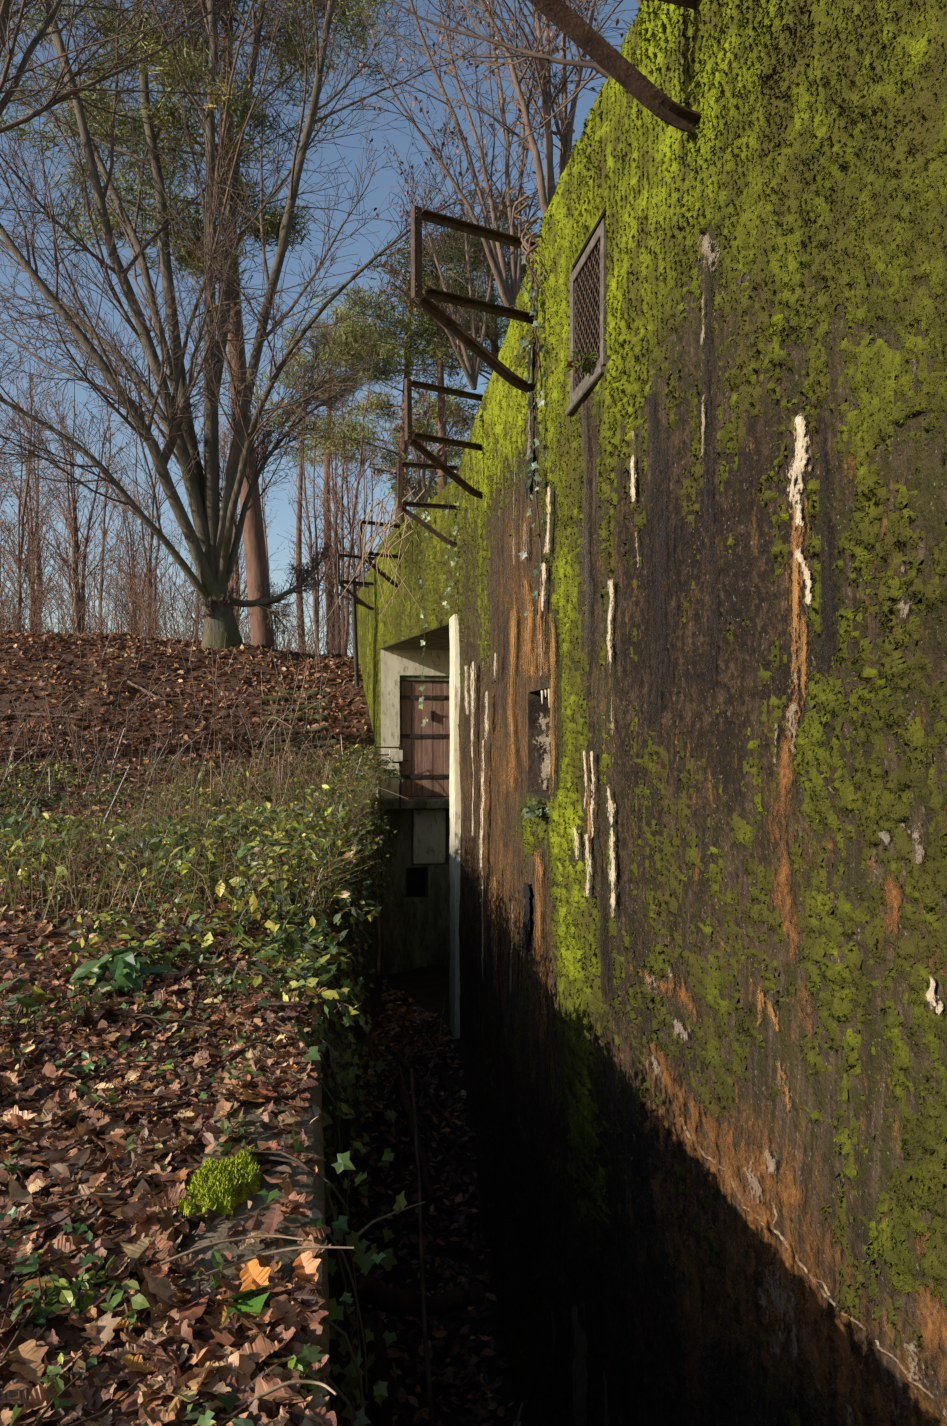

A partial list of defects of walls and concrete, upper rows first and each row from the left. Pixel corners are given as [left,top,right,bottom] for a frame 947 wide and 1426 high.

peeling [786,413,812,752]
corrosion [769,696,798,958]
corrosion [640,969,697,1041]
corrosion [757,990,779,1031]
corrosion [632,1042,947,1426]
crack [680,1118,934,1398]